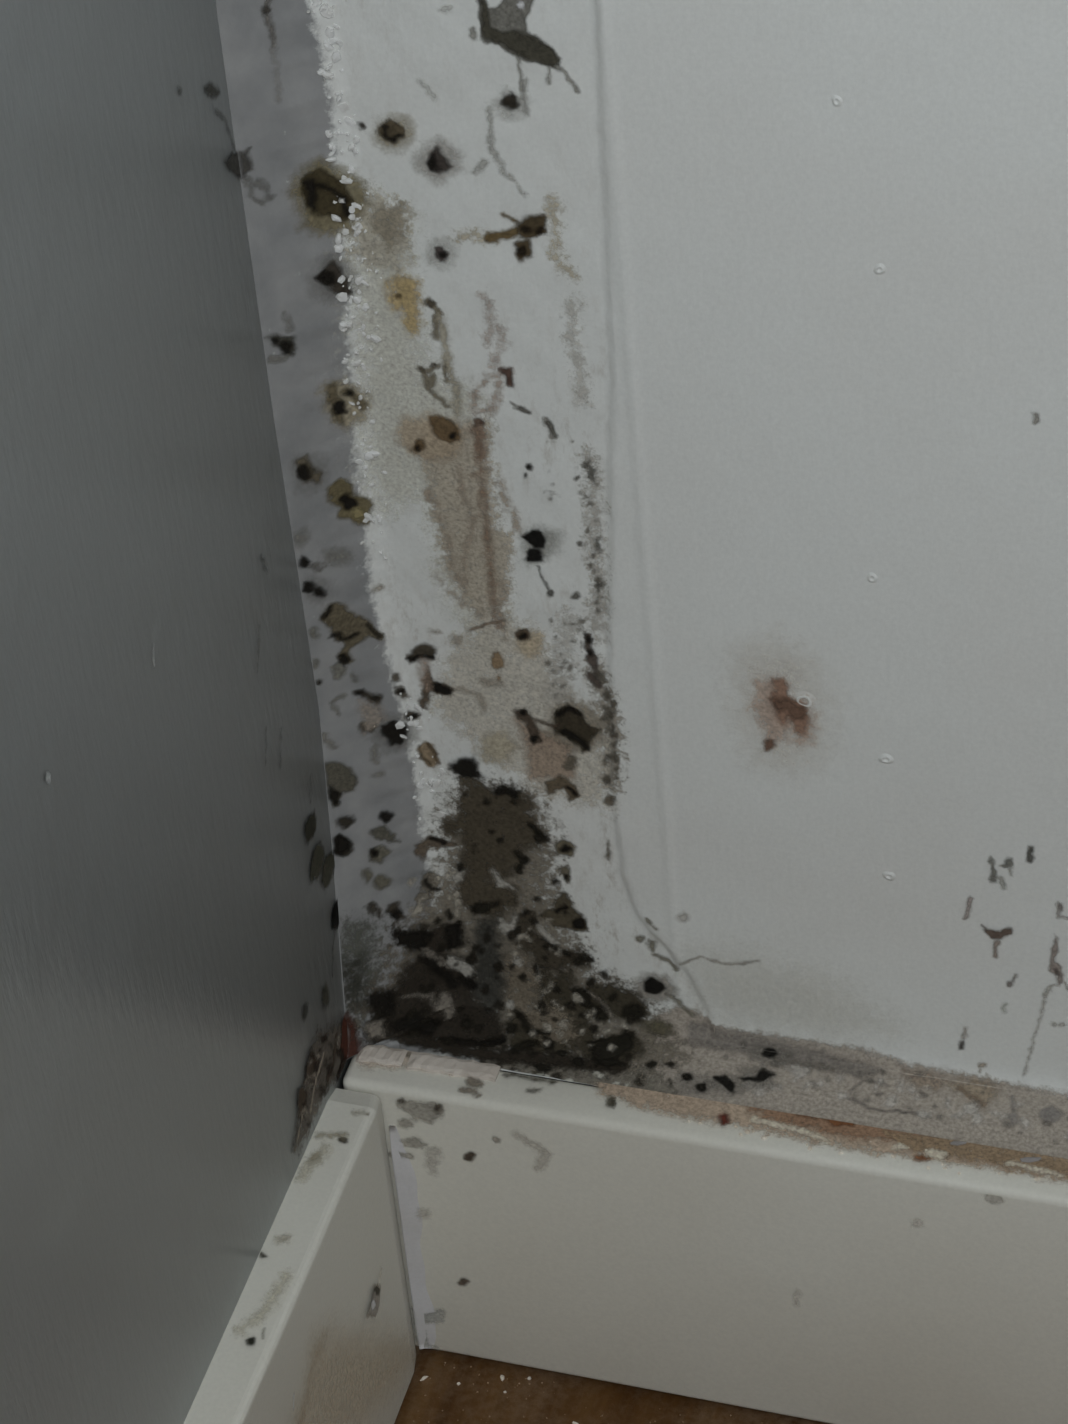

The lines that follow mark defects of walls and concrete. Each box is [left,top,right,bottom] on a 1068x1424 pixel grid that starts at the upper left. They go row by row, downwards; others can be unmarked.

peeling [470,0,579,92]
leakage [205,83,273,205]
leakage [359,119,412,146]
leakage [419,142,458,178]
leakage [499,94,523,115]
peeling [306,0,387,560]
leakage [269,321,295,362]
peeling [419,298,460,415]
leakage [291,160,1068,1160]
peeling [395,693,446,821]
rust [754,678,813,751]